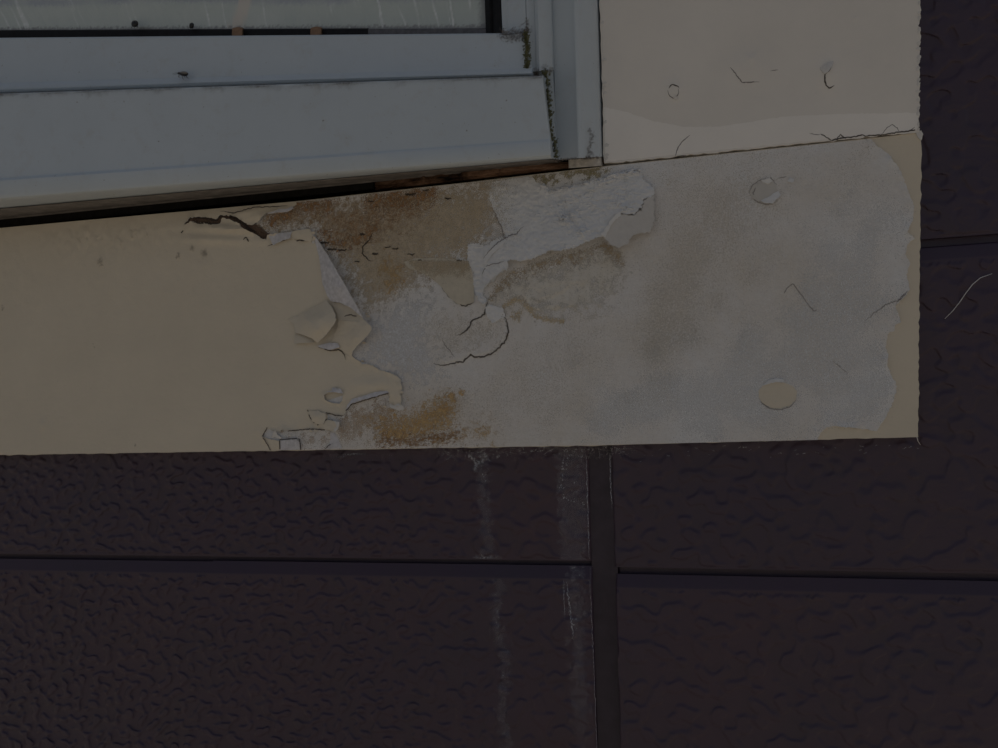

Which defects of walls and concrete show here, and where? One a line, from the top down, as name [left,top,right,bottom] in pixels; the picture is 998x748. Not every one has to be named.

rust [263,187,440,297]
peeling [252,139,915,450]
rust [280,388,496,449]